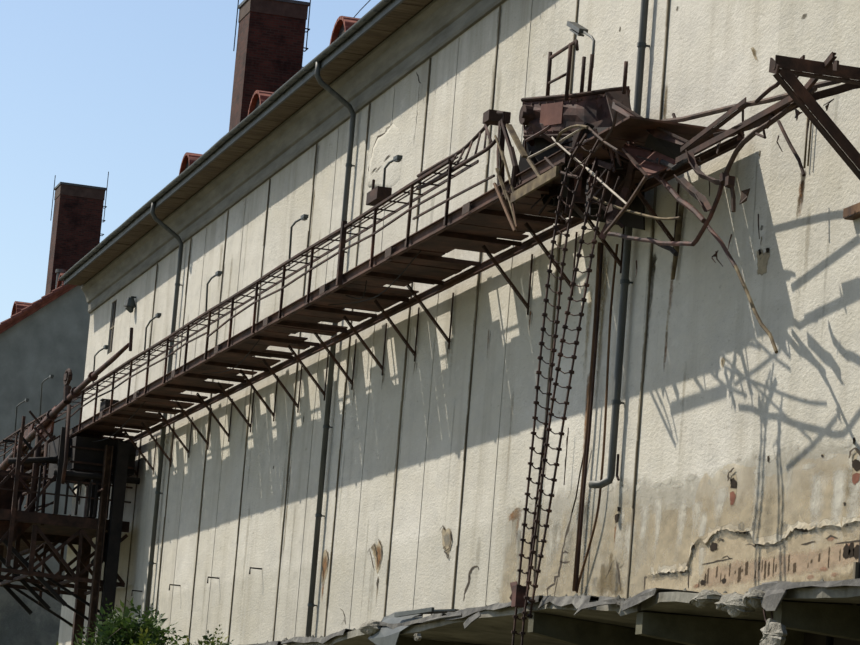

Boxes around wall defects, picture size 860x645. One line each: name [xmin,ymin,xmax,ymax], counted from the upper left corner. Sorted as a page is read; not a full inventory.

flaking render [501,437,860,603]
peeling [440,526,452,558]
crack [463,566,479,601]
damp [586,554,621,595]